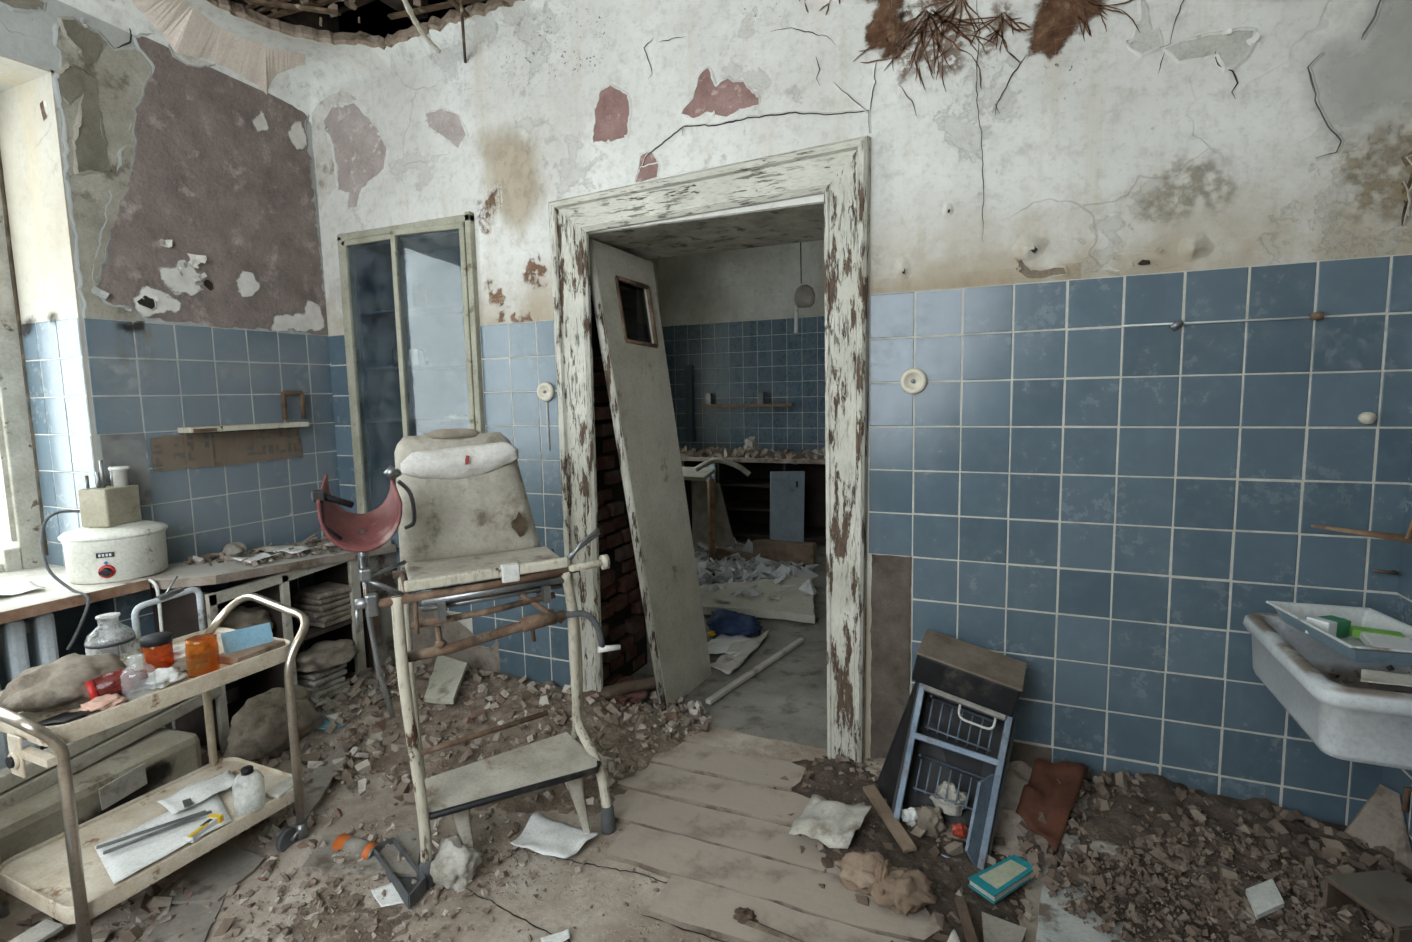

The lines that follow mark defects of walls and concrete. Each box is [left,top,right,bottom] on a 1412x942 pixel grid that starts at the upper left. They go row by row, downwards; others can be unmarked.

peeling [1126,0,1260,73]
crack [1361,0,1385,40]
peeling [0,0,390,336]
peeling [591,83,661,184]
peeling [680,66,761,121]
crack [634,27,917,183]
crack [976,3,1027,236]
crack [1307,52,1345,161]
crack [1401,151,1412,226]